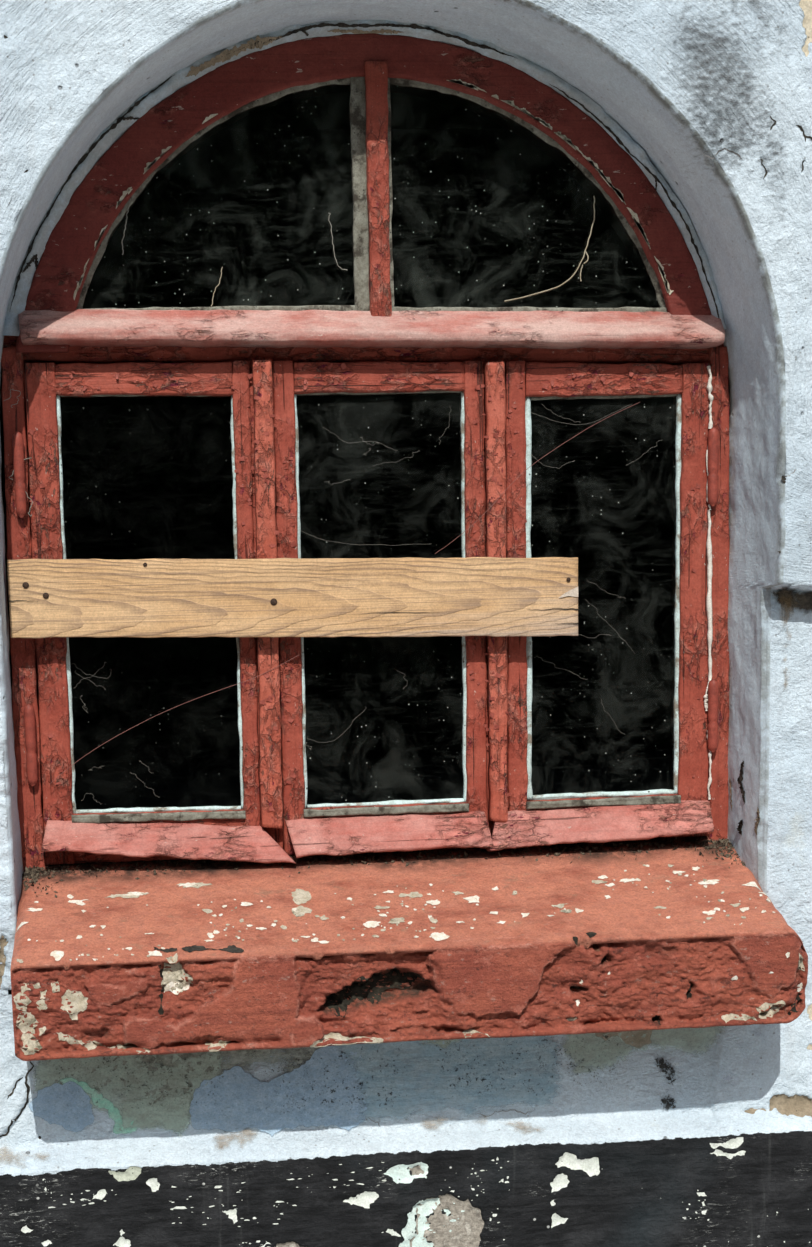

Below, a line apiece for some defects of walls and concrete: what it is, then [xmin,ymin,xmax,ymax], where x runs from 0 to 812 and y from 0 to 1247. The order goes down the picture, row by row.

water stain [674,18,755,164]
crack [703,148,768,179]
crack [770,116,812,172]
peeling [197,884,529,944]
peeling [13,981,150,1055]
crack [0,1062,34,1137]
peeling [744,1094,812,1117]
peeling [710,1137,746,1159]
peeling [43,1166,258,1227]
peeling [327,1162,428,1208]
peeling [382,1157,509,1247]
peeling [550,1152,600,1228]